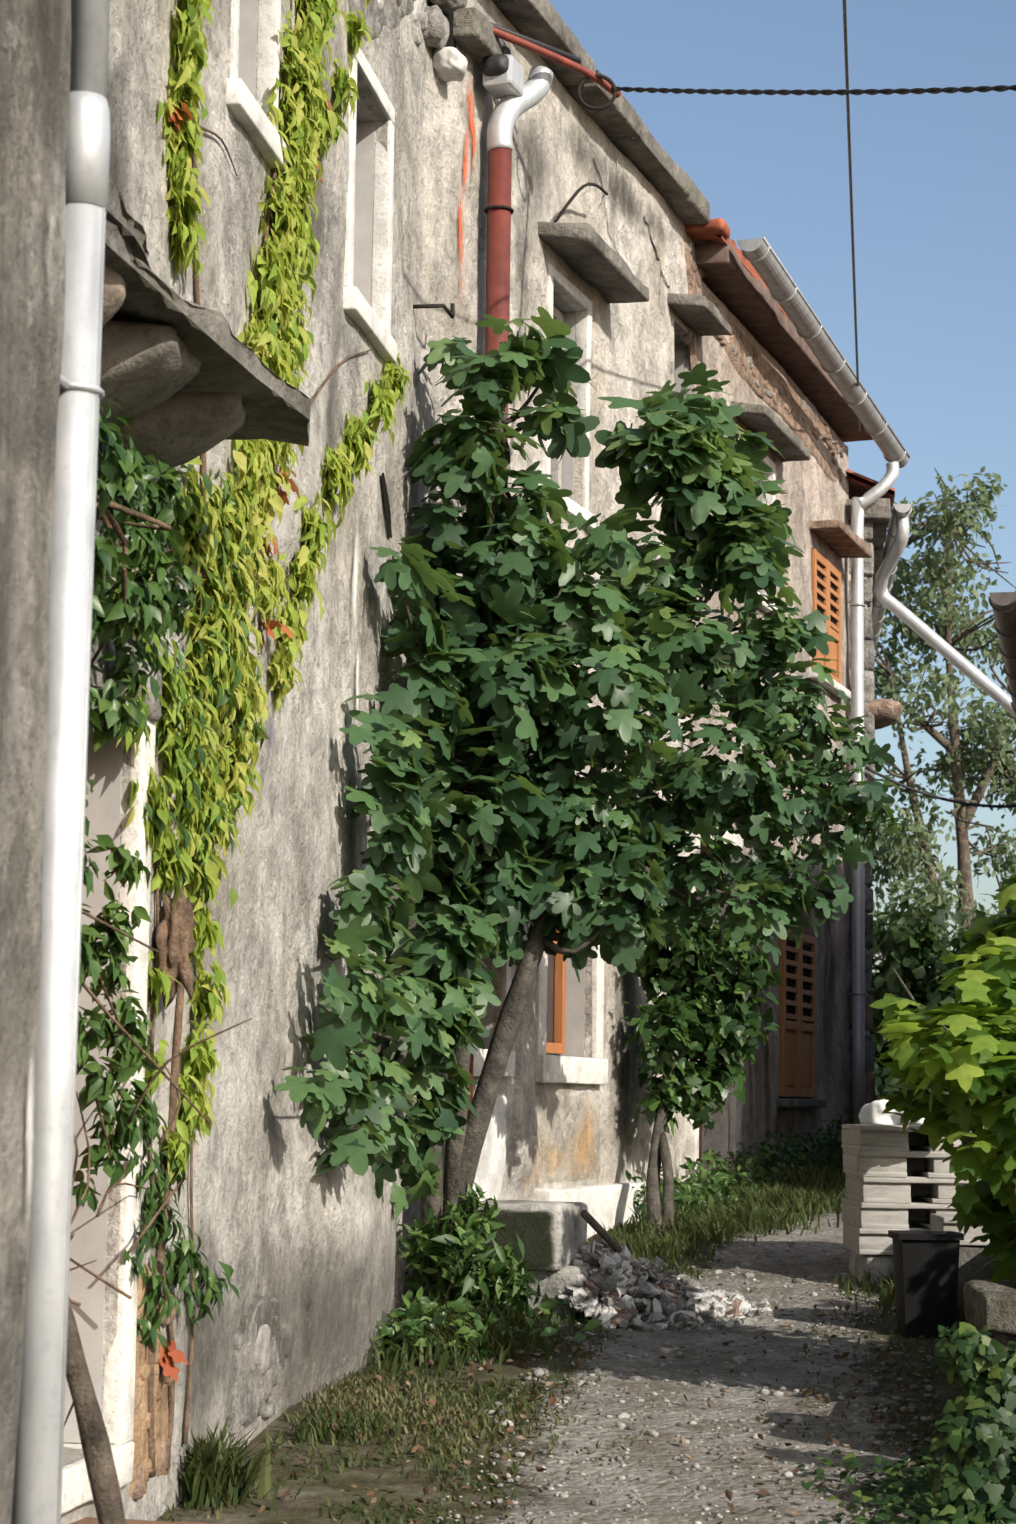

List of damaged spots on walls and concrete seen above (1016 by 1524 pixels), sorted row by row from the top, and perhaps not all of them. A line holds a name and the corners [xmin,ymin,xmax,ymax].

spalling [348,0,506,82]
rust [459,93,475,261]
spalling [683,239,844,483]